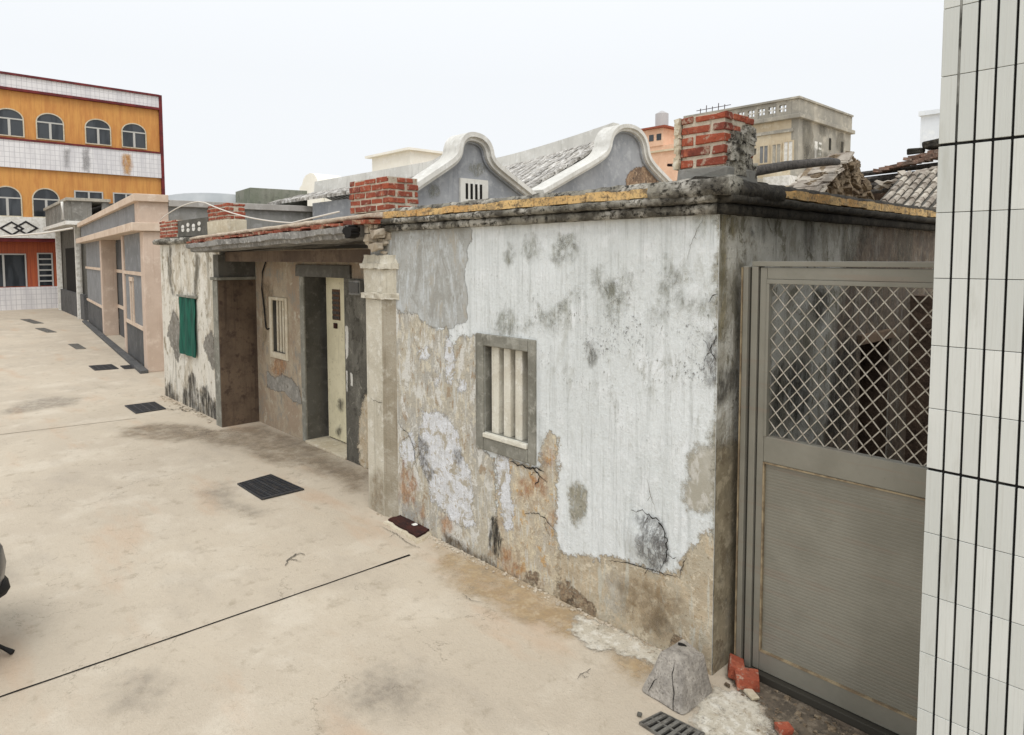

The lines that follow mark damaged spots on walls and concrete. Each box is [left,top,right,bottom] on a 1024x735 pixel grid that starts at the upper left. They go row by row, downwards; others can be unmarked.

water stain [165,372,358,480]
crack [510,461,547,484]
peeling [371,228,716,676]
crack [611,484,686,579]